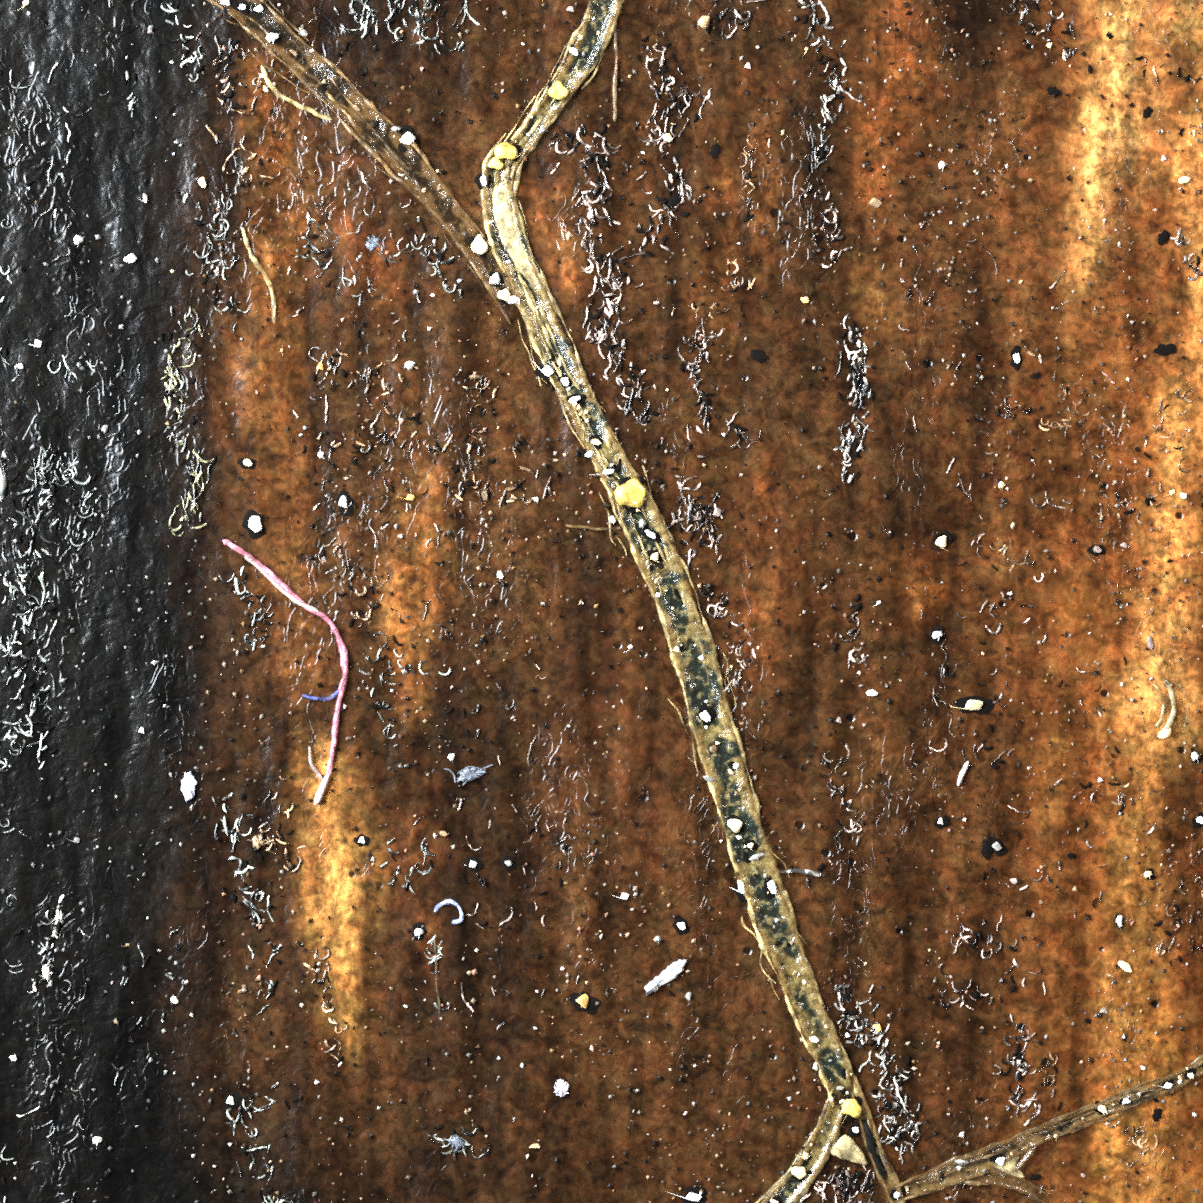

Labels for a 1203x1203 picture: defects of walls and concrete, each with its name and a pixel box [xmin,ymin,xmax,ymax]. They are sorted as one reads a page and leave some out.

crack [210,0,868,1203]
crack [844,1054,1203,1203]